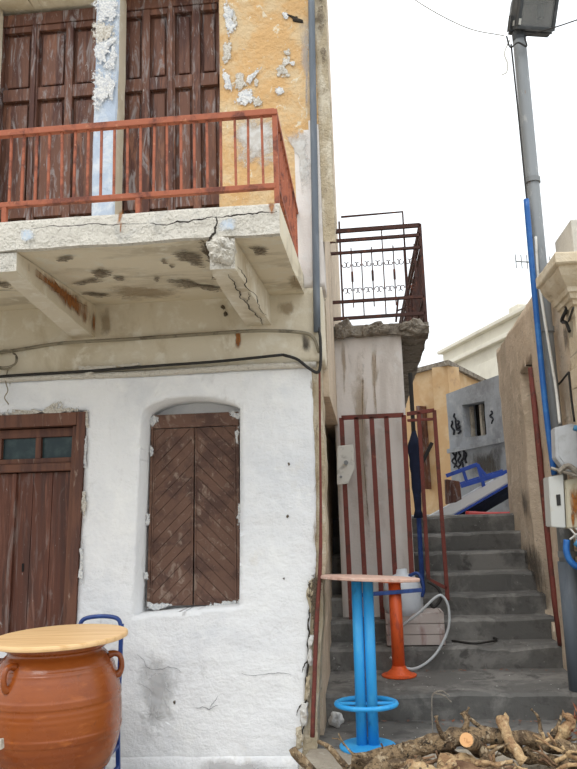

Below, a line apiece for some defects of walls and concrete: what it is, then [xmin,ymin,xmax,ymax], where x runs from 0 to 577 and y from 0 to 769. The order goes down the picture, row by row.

peeling [91,0,120,109]
peeling [221,0,262,107]
peeling [275,49,295,95]
crack [33,222,124,230]
crack [144,211,277,242]
rust [39,273,95,332]
crack [228,269,266,322]